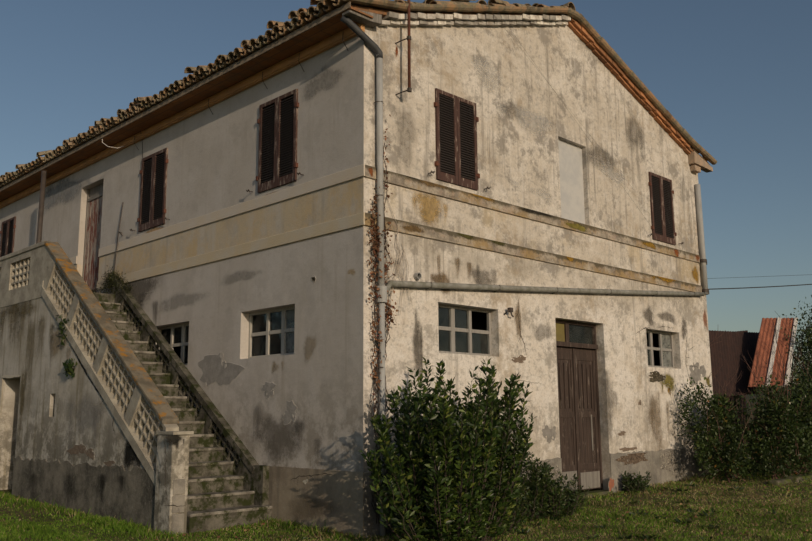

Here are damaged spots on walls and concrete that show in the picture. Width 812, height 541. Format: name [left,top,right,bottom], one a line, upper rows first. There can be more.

leakage [432,275,449,293]
leakage [0,300,67,366]
spalling [649,370,666,383]
peeling [689,362,706,387]
spalling [615,447,648,465]